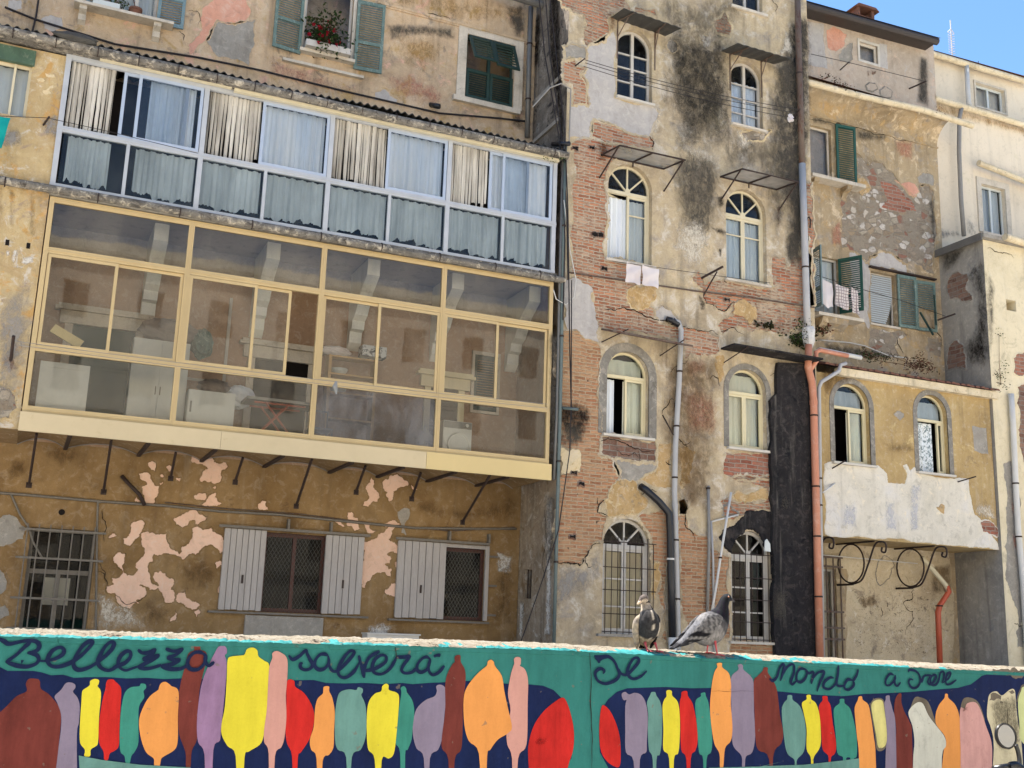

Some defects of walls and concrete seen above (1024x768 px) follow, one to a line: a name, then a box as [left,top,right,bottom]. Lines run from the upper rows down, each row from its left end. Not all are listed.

peeling [187,0,252,55]
leakage [674,41,724,128]
leakage [771,22,808,261]
leakage [678,156,717,232]
flaking render [857,177,919,214]
flaking render [551,56,817,568]
leakage [969,267,993,361]
peeling [105,456,229,623]
peeling [257,500,269,511]
peeling [334,473,418,598]
crack [542,514,599,589]